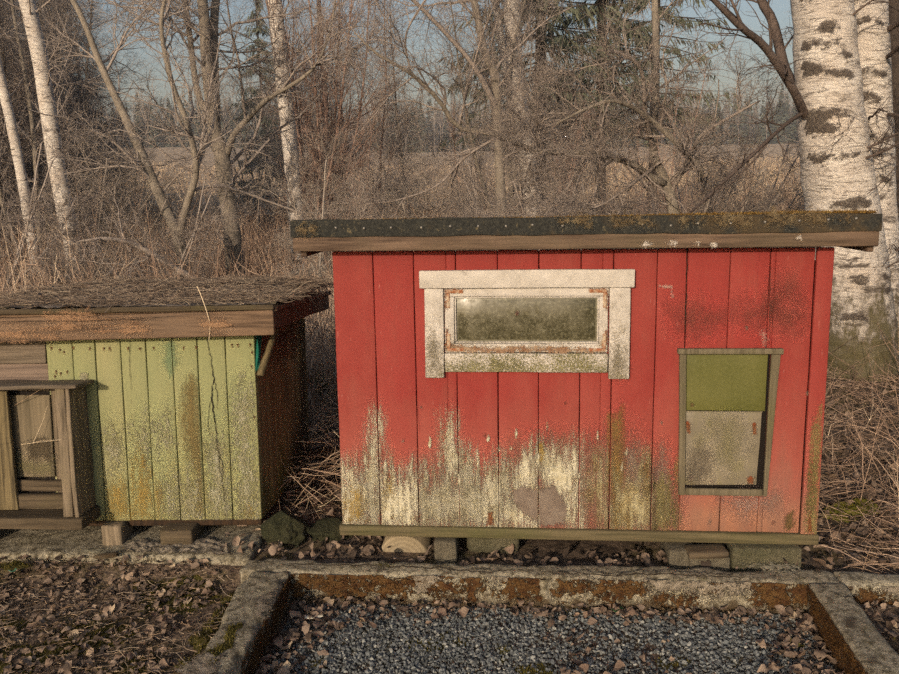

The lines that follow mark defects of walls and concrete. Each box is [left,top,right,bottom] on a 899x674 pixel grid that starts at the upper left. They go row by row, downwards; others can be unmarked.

crack [206,337,226,513]
peeling [340,405,670,530]